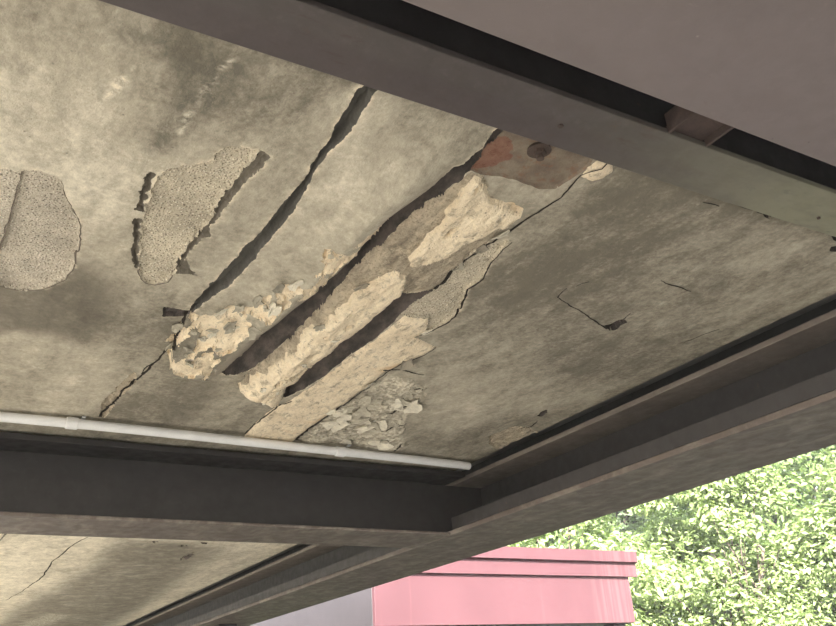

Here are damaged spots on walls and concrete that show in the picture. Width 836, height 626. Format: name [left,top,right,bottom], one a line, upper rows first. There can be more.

peeling [0,168,83,291]
peeling [130,146,270,285]
leakage [0,251,155,353]
crack [99,310,189,417]
peeling [162,307,194,317]
flaking render [244,240,508,453]
crack [295,163,607,440]
crack [557,282,628,329]
spalling [489,426,538,448]
crack [7,537,88,600]